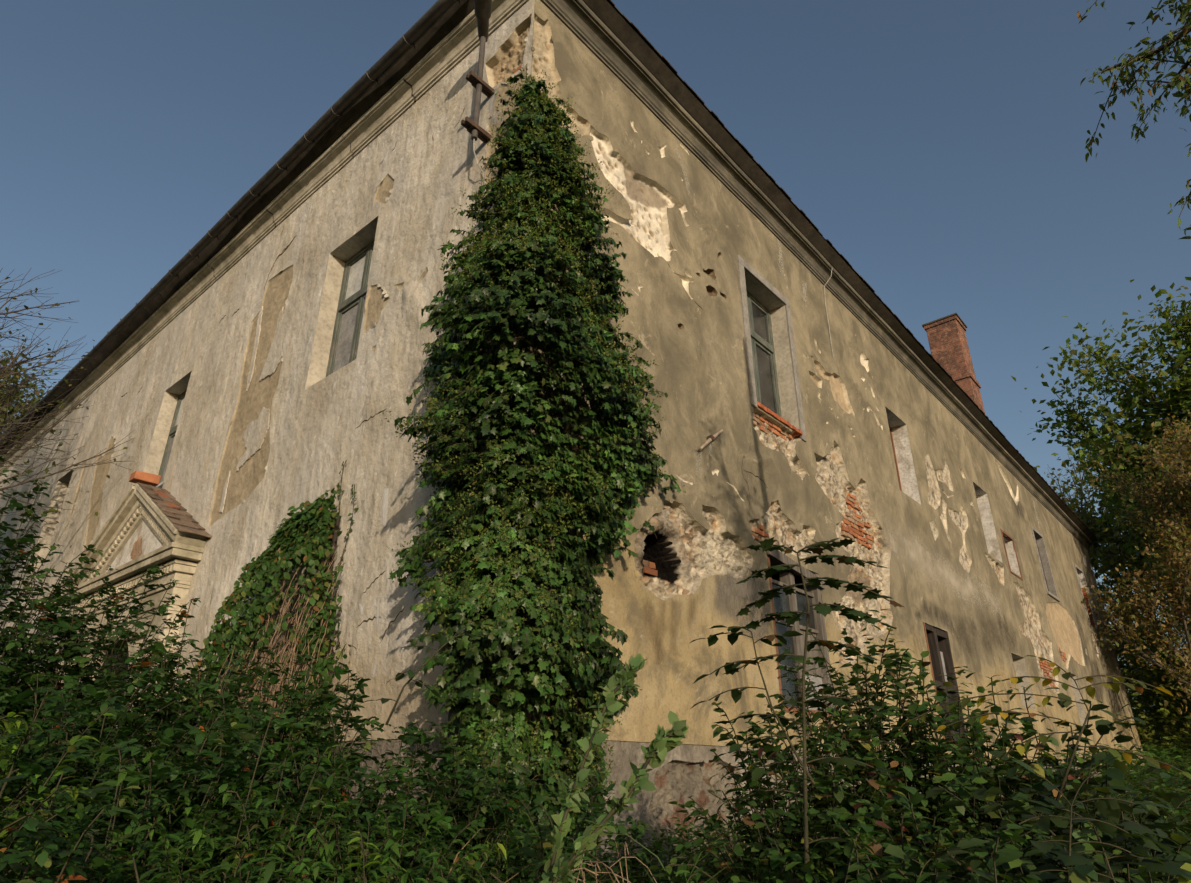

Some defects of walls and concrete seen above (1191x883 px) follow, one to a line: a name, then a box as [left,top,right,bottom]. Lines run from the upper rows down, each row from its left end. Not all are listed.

flaking render [482,13,727,300]
flaking render [807,336,883,437]
spalling [634,498,817,601]
flaking render [753,407,893,665]
flaking render [925,453,973,573]
flaking render [995,461,1019,505]
flaking render [984,552,1108,696]